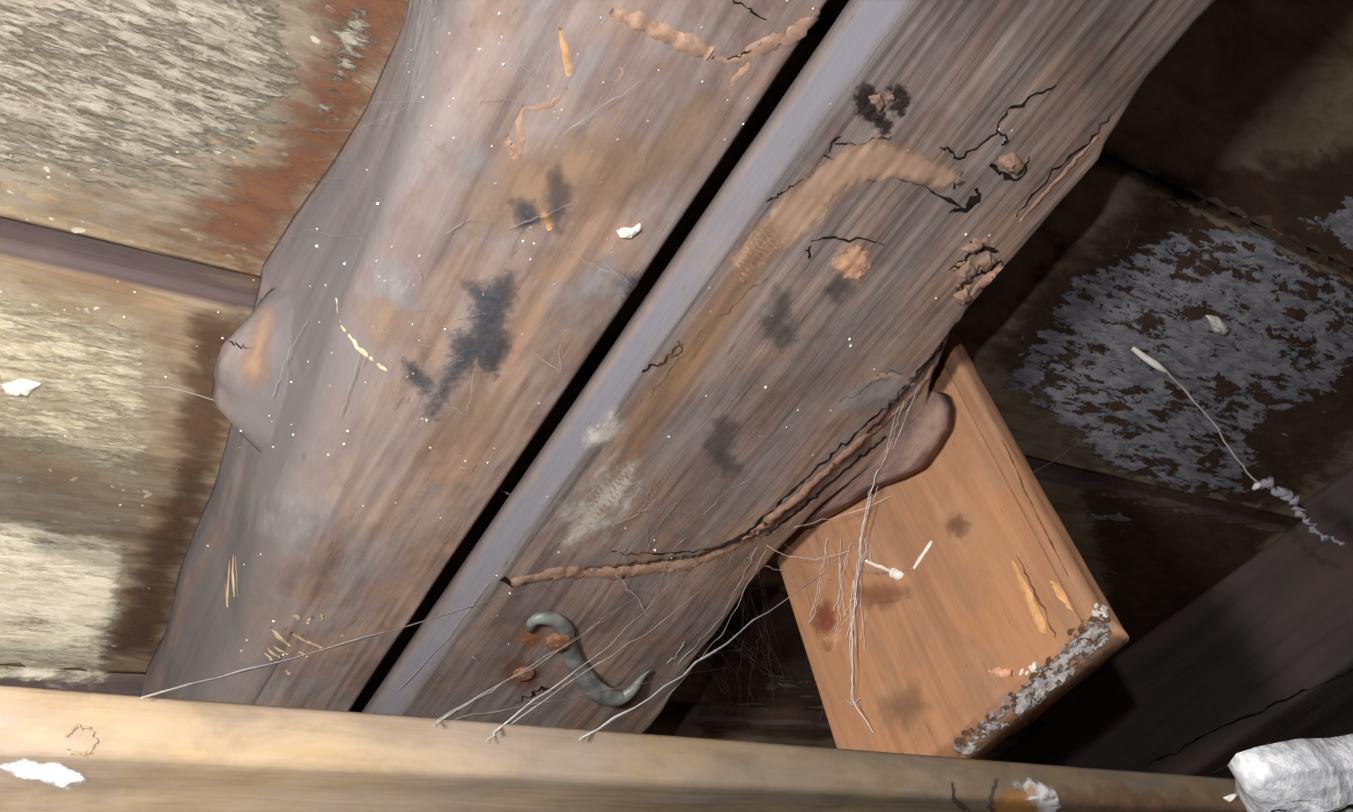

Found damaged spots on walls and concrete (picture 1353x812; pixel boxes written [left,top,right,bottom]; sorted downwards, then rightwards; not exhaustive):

damp [193,0,407,266]
damp [514,176,567,226]
crack [766,85,1110,305]
damp [407,274,515,415]
damp [995,149,1353,670]